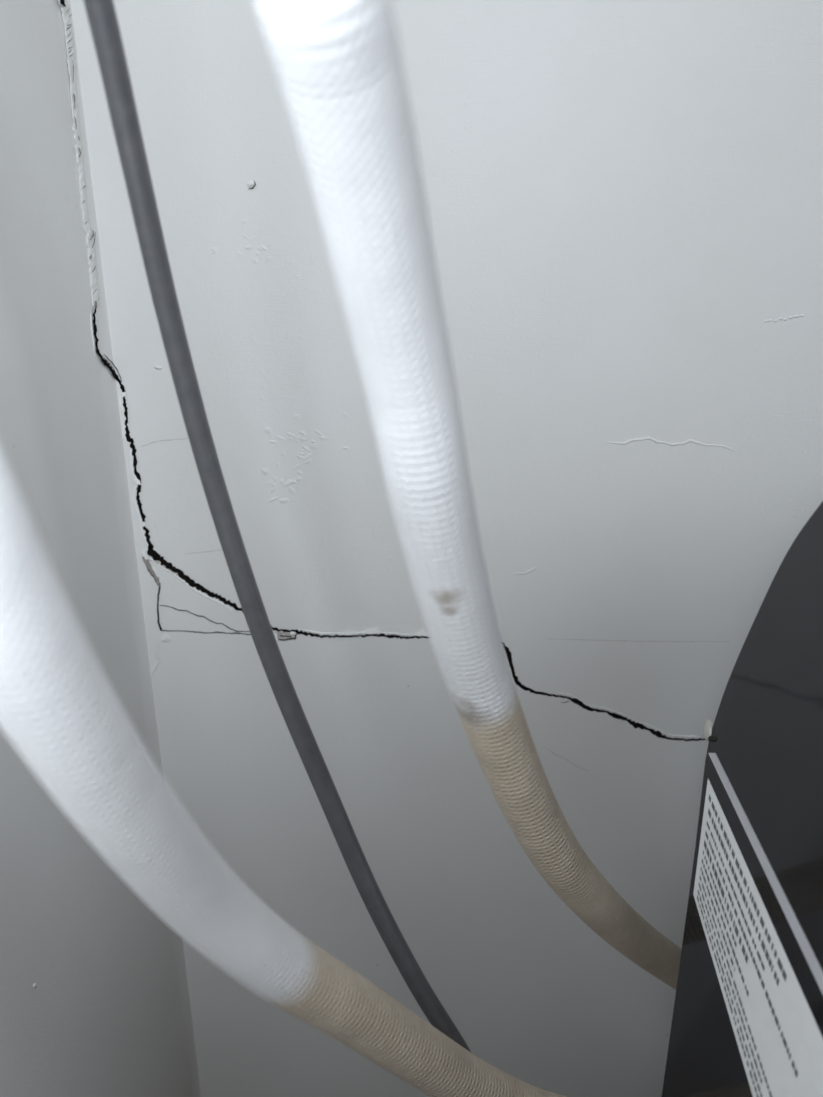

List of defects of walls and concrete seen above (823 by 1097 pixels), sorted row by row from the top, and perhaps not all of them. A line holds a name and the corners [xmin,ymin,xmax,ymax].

crack [90,304,429,639]
crack [502,642,705,741]